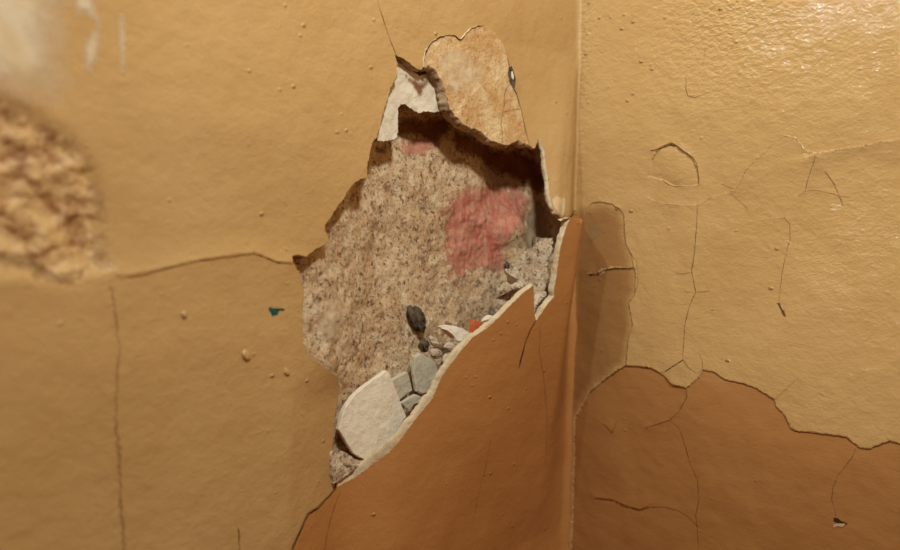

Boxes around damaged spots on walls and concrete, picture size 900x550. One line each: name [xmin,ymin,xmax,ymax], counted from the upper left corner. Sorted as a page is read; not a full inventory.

crack [109,254,288,550]
spalling [292,26,574,460]
crack [599,157,759,547]
peeling [571,366,900,550]
crack [777,219,790,317]
crack [832,452,855,528]